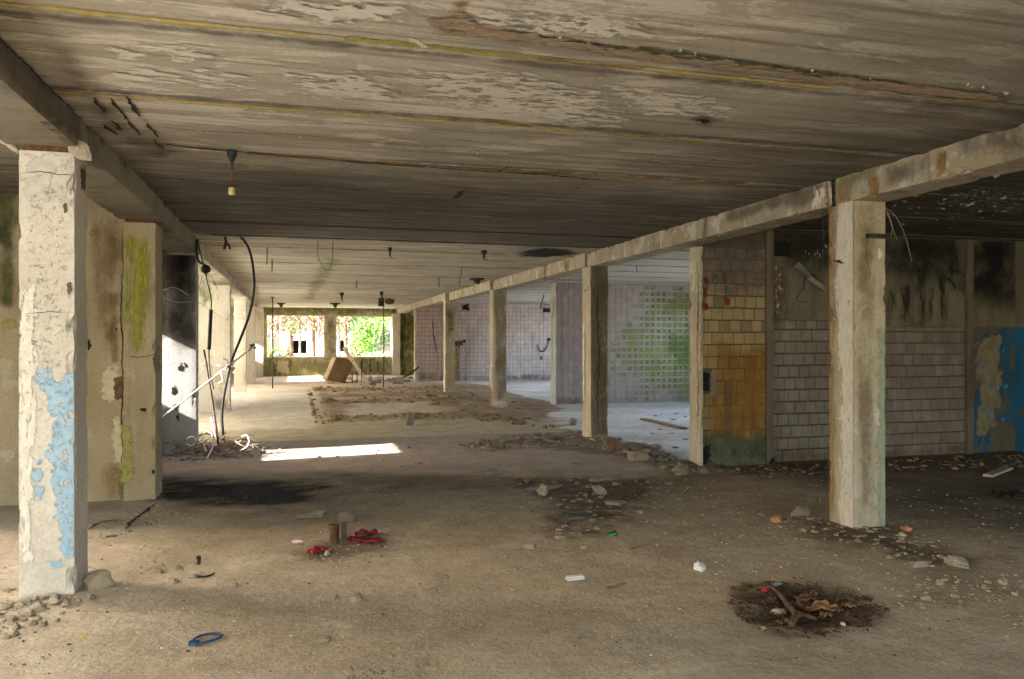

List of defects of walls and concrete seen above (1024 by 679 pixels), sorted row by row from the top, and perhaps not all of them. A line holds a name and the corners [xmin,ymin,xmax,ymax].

peeling [233,0,414,29]
spalling [426,2,1014,102]
peeling [279,69,400,102]
peeling [403,69,737,128]
spalling [0,140,92,202]
corrosion [937,151,946,175]
water stain [891,240,957,322]
peeling [100,364,123,403]
crack [120,230,154,485]
peeling [974,334,1008,437]
peeling [19,281,74,569]
peeling [110,412,125,477]